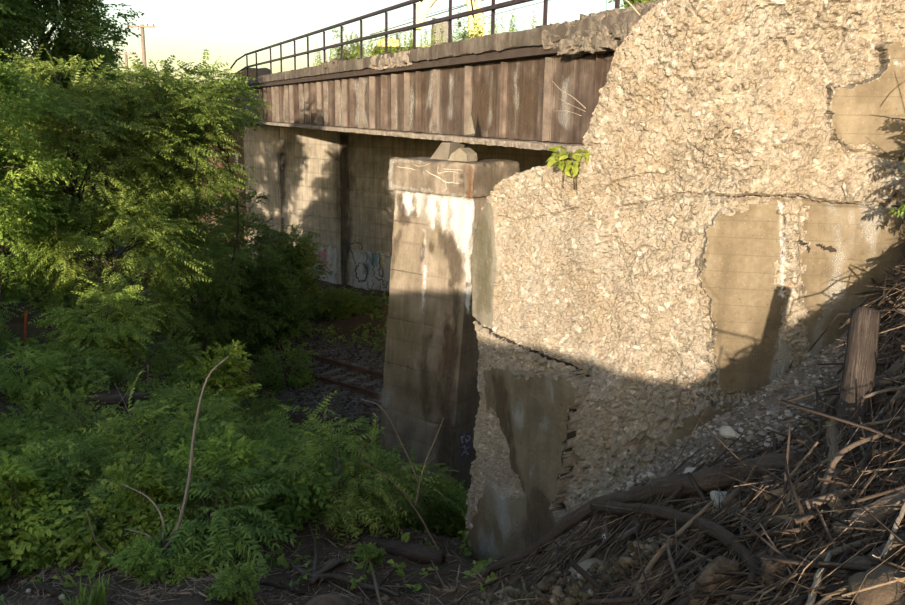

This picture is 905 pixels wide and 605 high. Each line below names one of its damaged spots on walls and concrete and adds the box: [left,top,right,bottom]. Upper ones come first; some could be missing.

rust [474,81,497,129]
rust [510,78,535,133]
crack [699,186,905,207]
damp [398,192,474,312]
spalling [465,0,905,540]
crack [471,314,591,377]